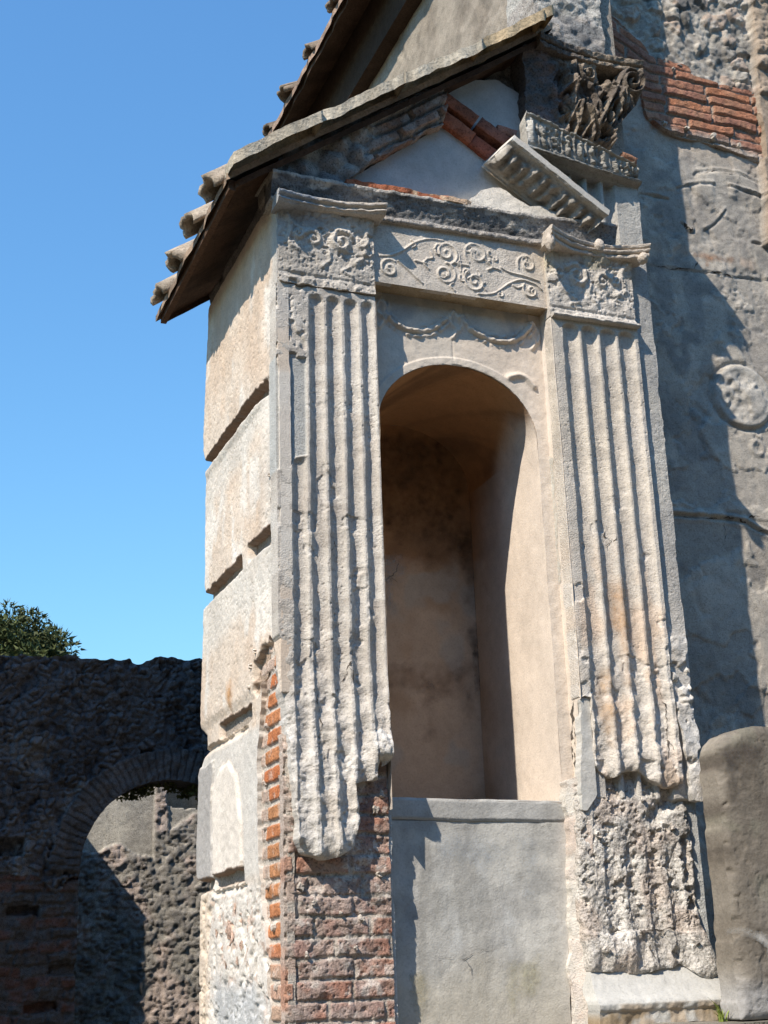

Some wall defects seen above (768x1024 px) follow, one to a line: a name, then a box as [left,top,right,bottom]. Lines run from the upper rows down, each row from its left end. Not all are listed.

spalling [573,772,718,979]